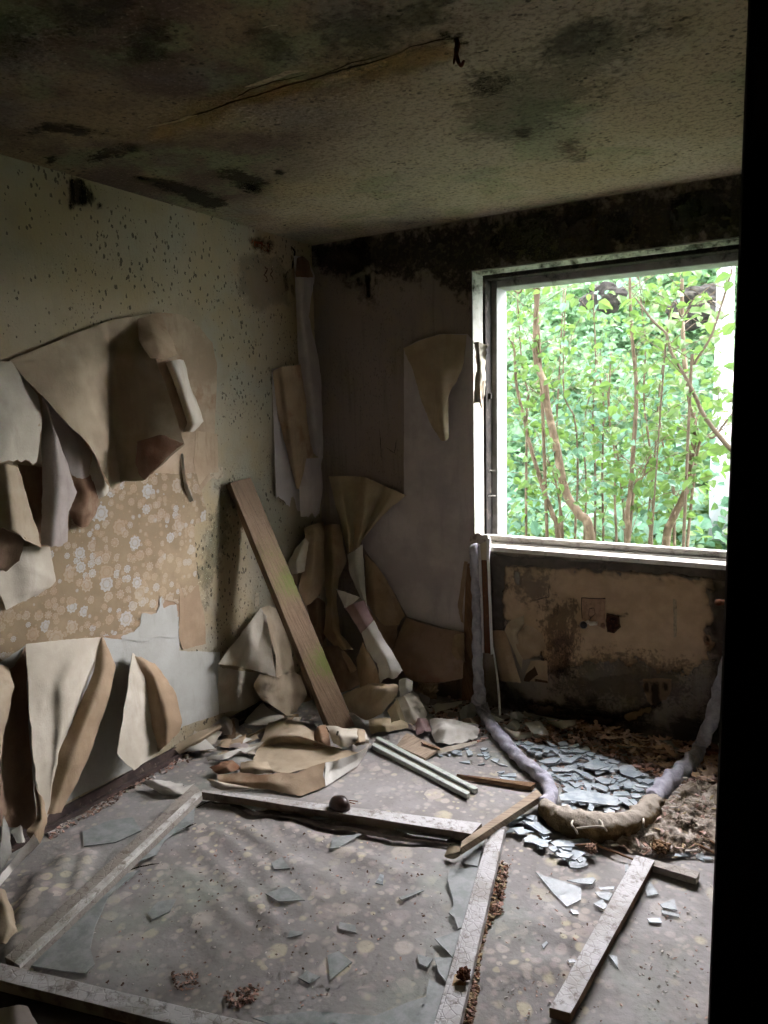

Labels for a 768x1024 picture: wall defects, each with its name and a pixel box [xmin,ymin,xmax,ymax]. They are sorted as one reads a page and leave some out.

crack [149,39,450,128]
mould [26,122,92,138]
mould [69,178,102,210]
mould [134,176,228,209]
mould [217,167,284,193]
mould [312,174,741,304]
hole [605,613,627,633]
damp [490,553,726,743]